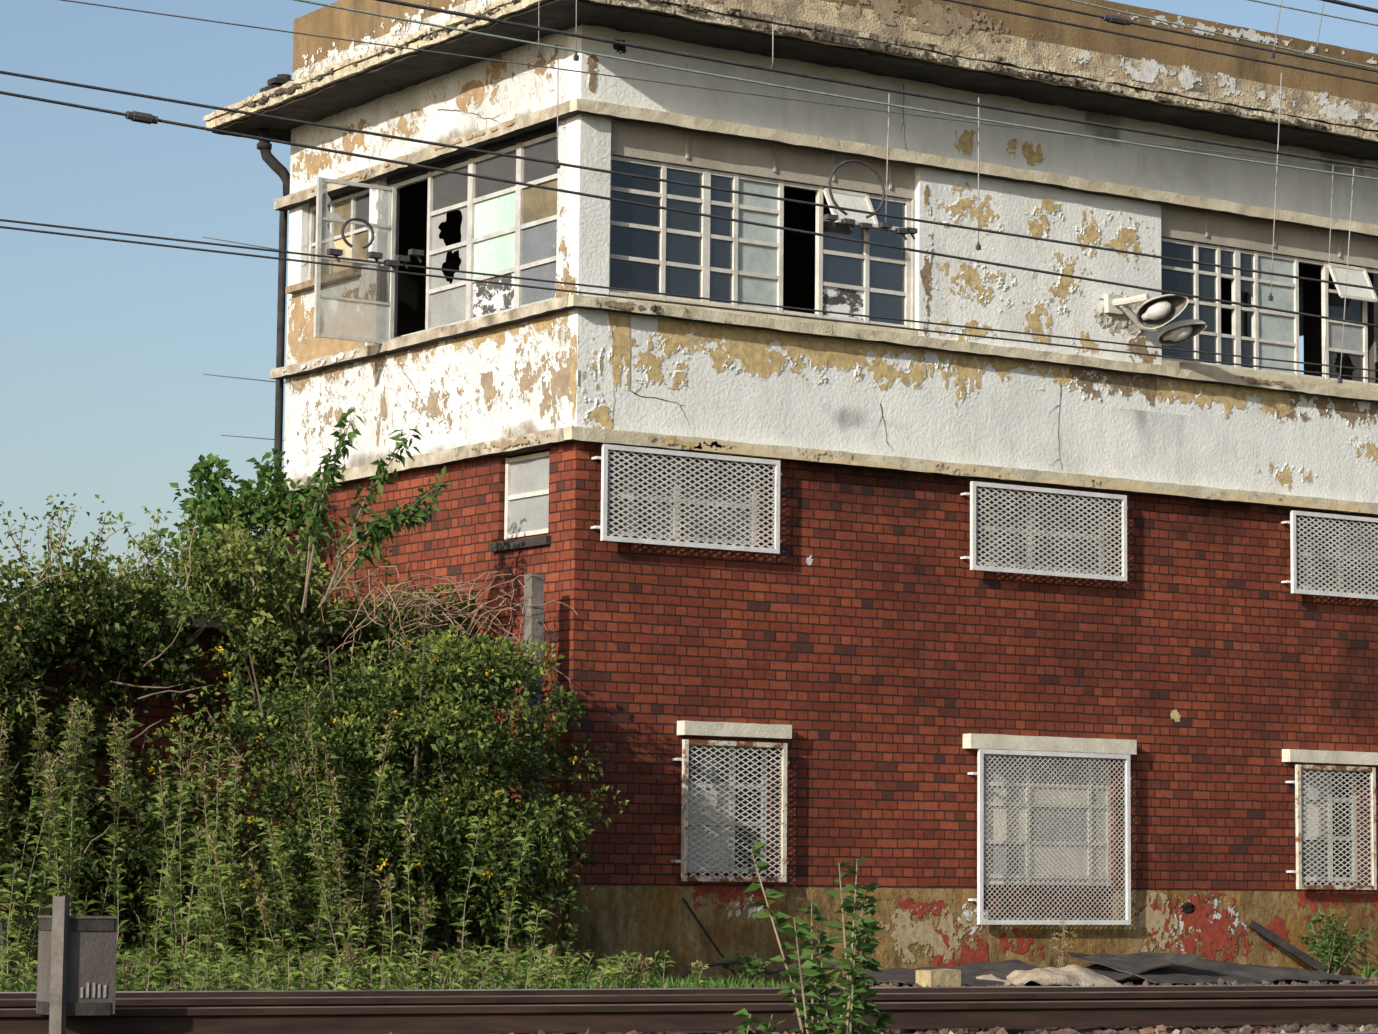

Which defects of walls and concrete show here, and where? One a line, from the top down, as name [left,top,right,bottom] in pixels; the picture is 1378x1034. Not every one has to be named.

spalling [365,0,519,56]
peeling [1119,10,1222,36]
spalling [217,42,356,118]
flaking render [455,43,568,114]
spalling [1155,65,1332,131]
flaking render [291,107,427,197]
peeling [282,181,1378,465]
crack [612,384,689,428]
crack [1051,392,1062,467]
peeling [629,435,1370,513]
flaking render [876,894,1044,967]
peeling [1134,891,1289,963]